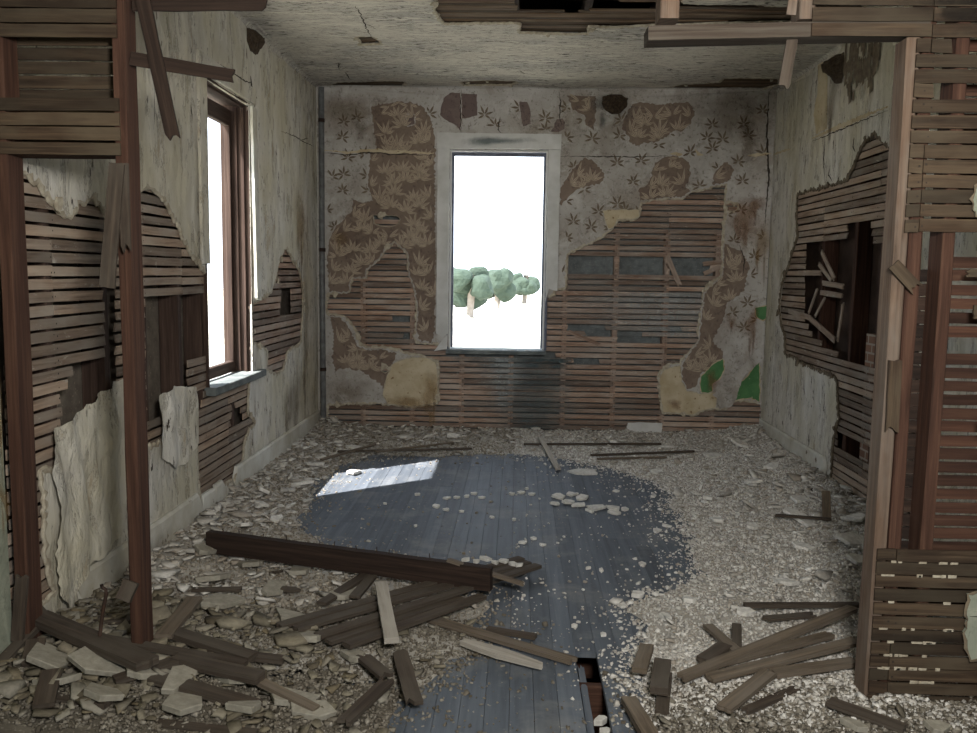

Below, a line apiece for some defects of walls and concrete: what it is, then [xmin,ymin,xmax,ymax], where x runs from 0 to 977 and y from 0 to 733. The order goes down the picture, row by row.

spalling [430,0,656,37]
spalling [676,0,791,25]
peeling [841,42,881,105]
spalling [23,170,123,606]
spalling [140,184,256,495]
spalling [248,246,306,376]
spalling [325,183,762,432]
spalling [755,130,889,498]